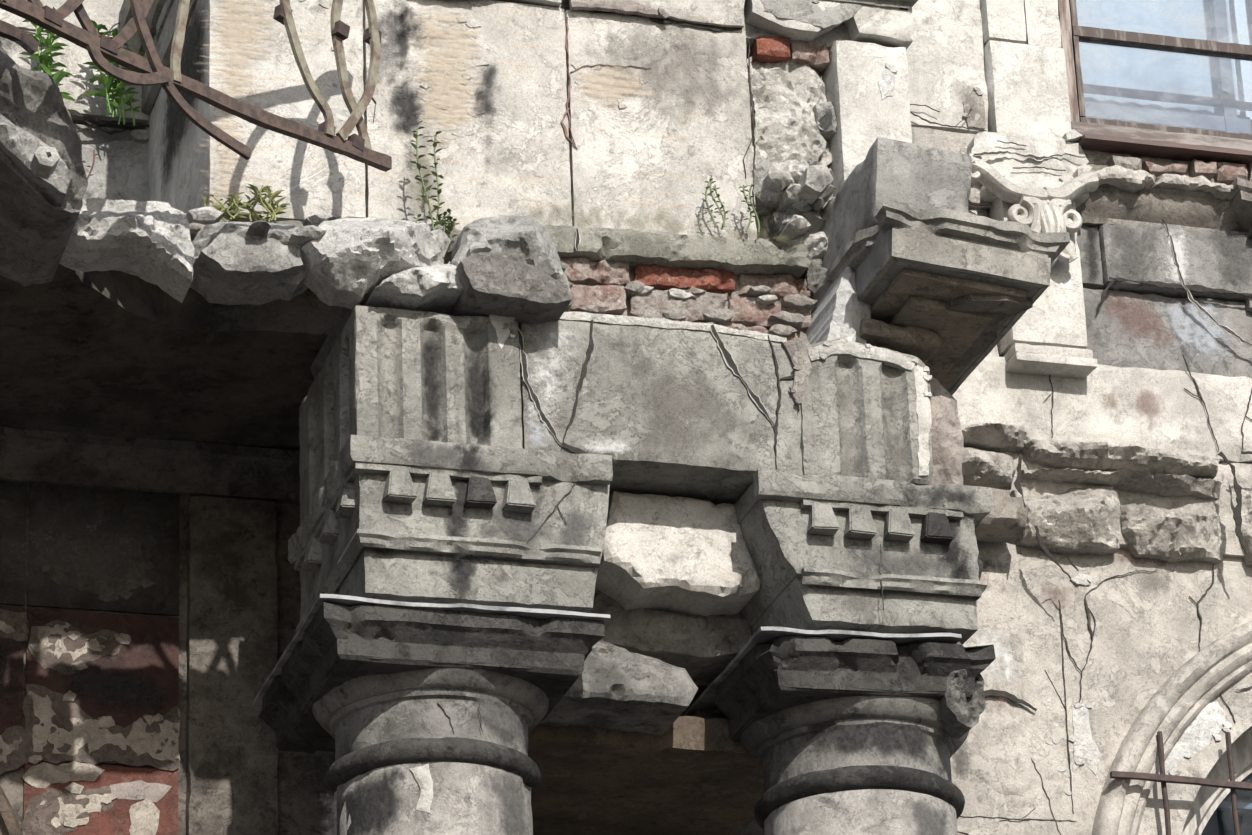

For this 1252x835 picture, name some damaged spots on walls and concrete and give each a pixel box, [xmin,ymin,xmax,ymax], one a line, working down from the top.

peeling [213,0,271,100]
leakage [476,65,496,112]
crack [910,104,1089,171]
flaking render [0,46,932,476]
crack [1100,219,1252,346]
crack [518,320,594,544]
crack [710,324,794,470]
crack [1182,355,1252,554]
peeling [0,609,131,675]
crack [960,454,1158,835]
peeling [0,684,180,835]
peeling [1164,701,1232,775]